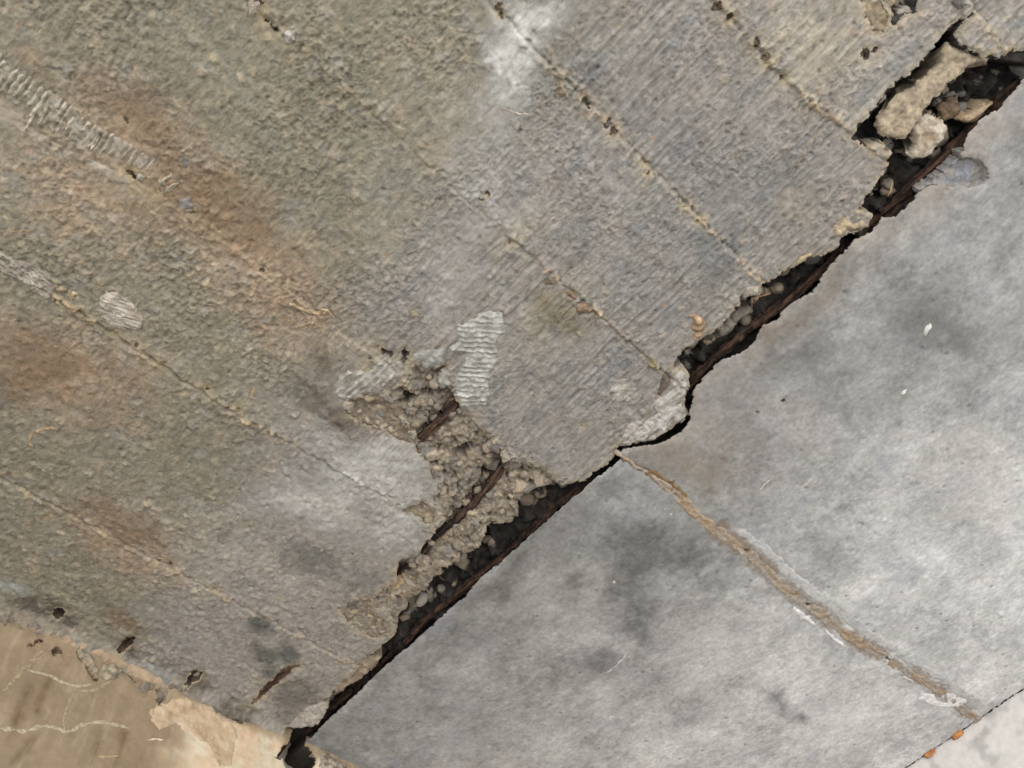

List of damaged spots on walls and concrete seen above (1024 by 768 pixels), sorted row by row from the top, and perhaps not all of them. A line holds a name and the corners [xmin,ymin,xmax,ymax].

spalling [686,13,1024,395]
crack [854,45,1024,217]
spalling [275,346,592,768]
crack [304,233,852,732]
hole [116,636,136,654]
peeling [149,670,242,767]
spalling [246,664,300,707]
crack [906,689,1024,768]